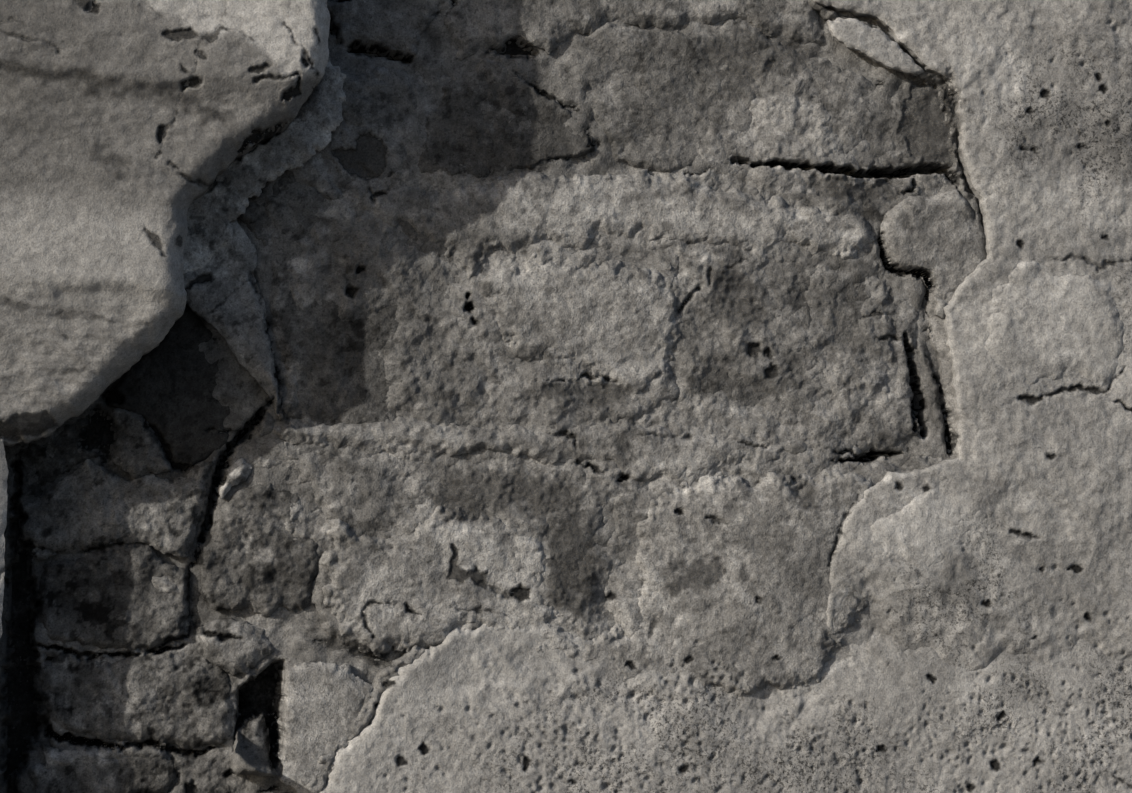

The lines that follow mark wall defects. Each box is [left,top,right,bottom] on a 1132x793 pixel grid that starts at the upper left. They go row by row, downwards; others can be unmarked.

peeling [163,26,227,43]
crack [155,49,224,191]
crack [238,22,320,159]
spalling [807,0,982,228]
spalling [331,132,387,181]
crack [732,160,958,192]
peeling [145,229,165,257]
spalling [464,294,478,325]
spalling [748,343,779,378]
crack [1018,371,1132,411]
spalling [447,544,530,601]
spalling [306,645,426,793]